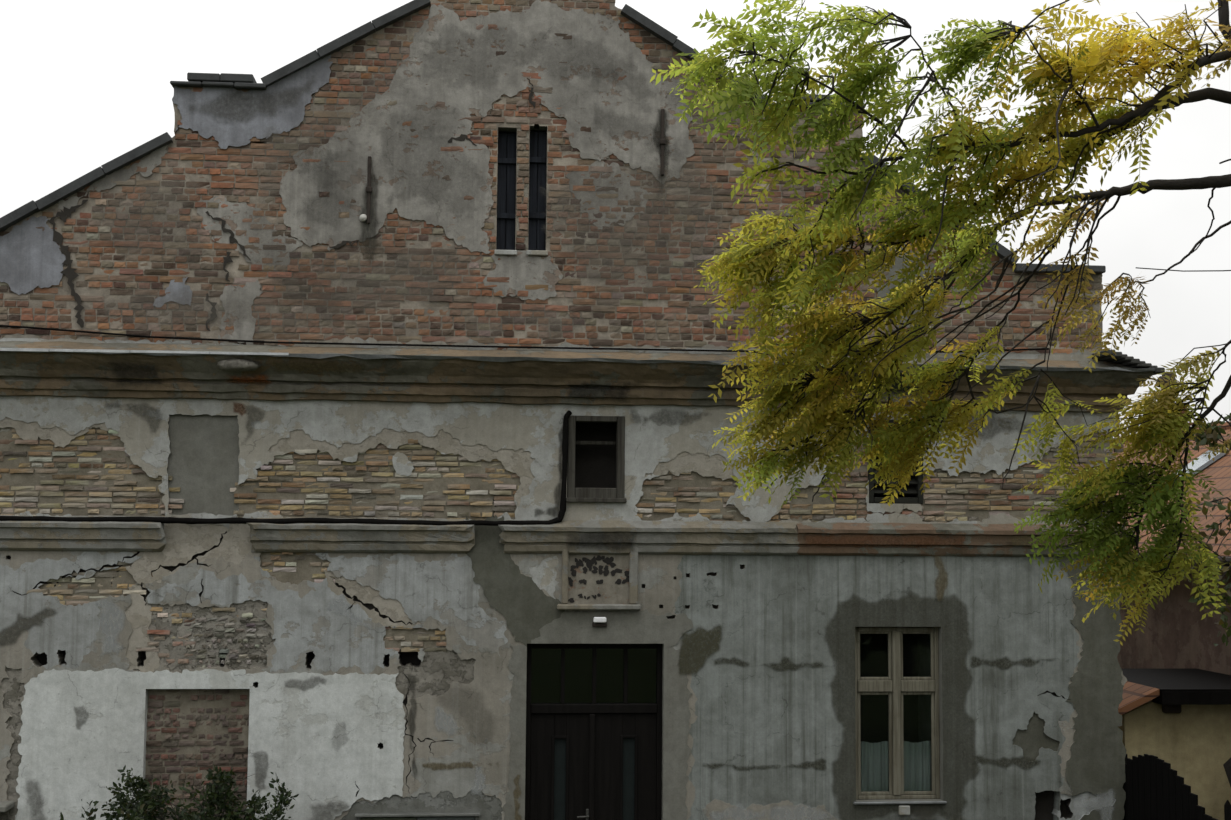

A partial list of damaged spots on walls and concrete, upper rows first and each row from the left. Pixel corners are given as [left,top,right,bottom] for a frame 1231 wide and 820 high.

flaking render [0,0,1103,357]
crack [48,199,88,328]
crack [205,211,251,331]
flaking render [0,427,185,516]
flaking render [230,439,521,520]
flaking render [635,471,751,521]
flaking render [769,429,1124,523]
crack [13,531,227,606]
crack [334,578,412,625]
flaking render [26,561,276,819]
flaking render [1012,712,1060,760]